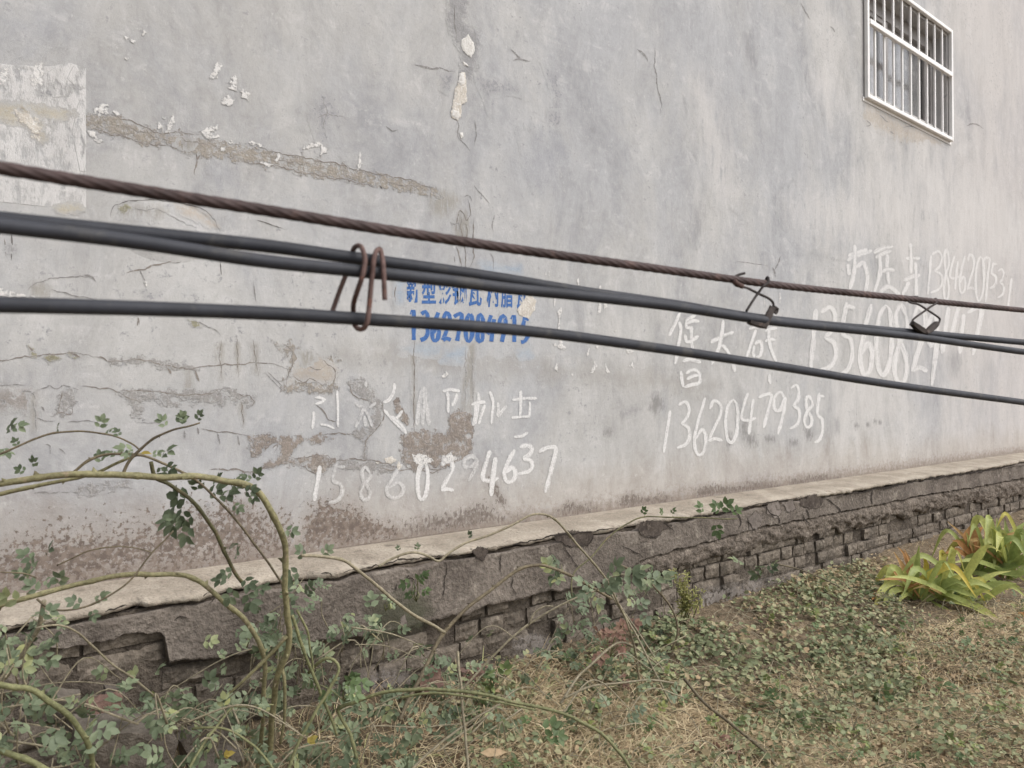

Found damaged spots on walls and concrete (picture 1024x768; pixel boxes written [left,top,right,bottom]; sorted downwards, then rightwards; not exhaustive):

peeling [0,175,86,207]
peeling [0,61,444,201]
flaking render [416,0,484,151]
crack [654,52,662,111]
crack [27,274,96,299]
crack [127,261,180,286]
flaking render [87,338,476,478]
damp [0,469,535,595]